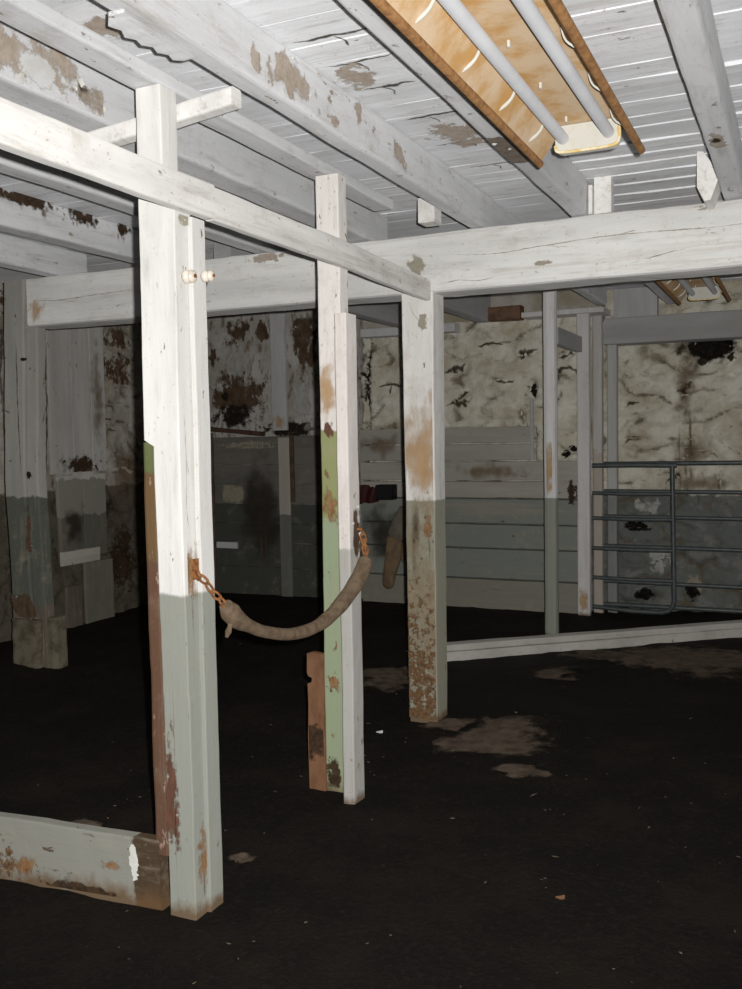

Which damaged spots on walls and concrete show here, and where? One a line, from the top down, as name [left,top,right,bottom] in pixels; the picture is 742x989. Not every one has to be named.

peeling [0,21,106,115]
peeling [250,44,339,128]
peeling [334,62,376,91]
peeling [103,327,134,388]
peeling [208,349,268,427]
peeling [224,317,270,347]
peeling [289,316,319,382]
rust [320,368,333,410]
spalling [688,340,737,366]
rust [405,422,433,489]
rust [322,491,337,521]
rust [407,516,436,720]